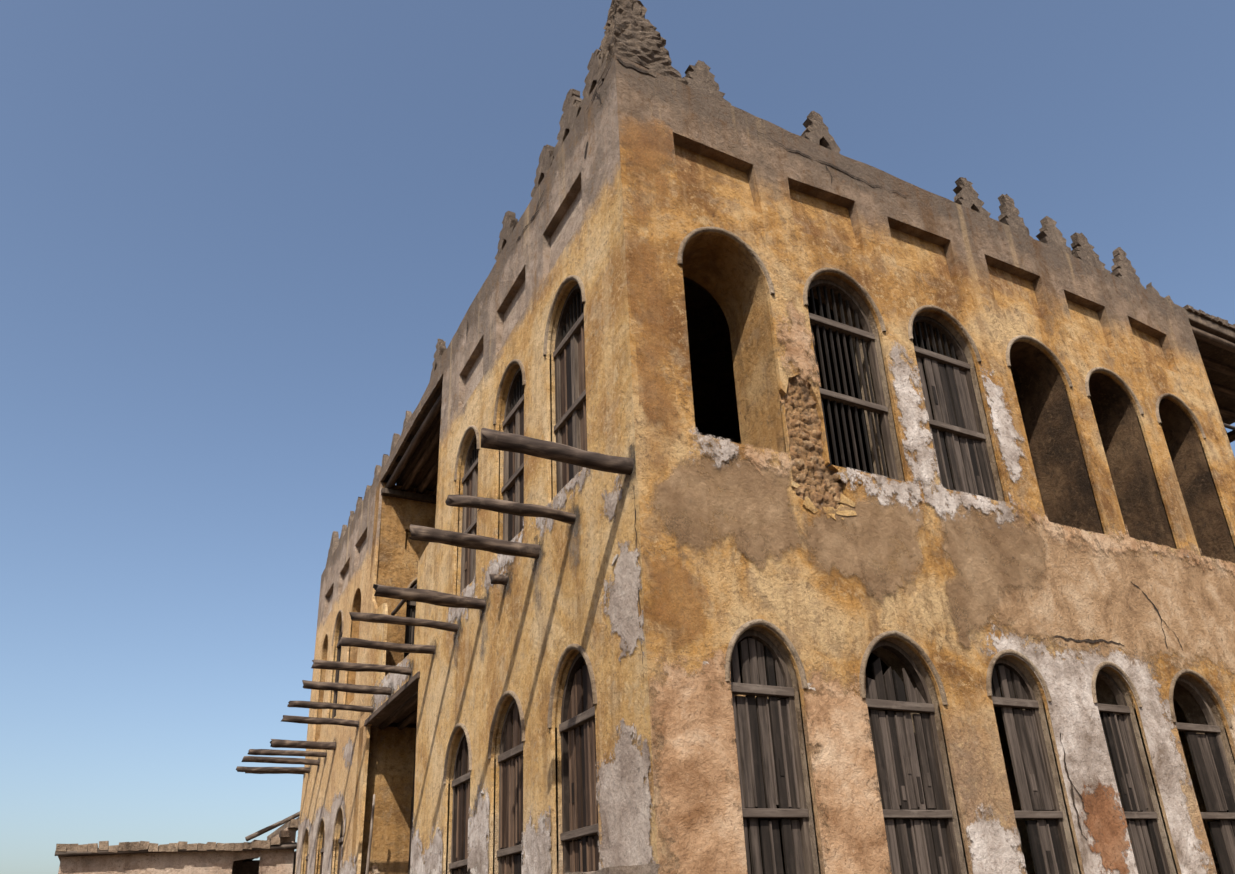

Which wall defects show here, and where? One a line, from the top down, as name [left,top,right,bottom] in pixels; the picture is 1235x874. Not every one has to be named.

leakage [651,455,924,603]
peeling [689,302,1235,874]
leakage [942,507,1046,648]
peeling [595,540,748,874]
peeling [295,791,380,874]
peeling [410,818,443,874]
peeling [467,784,489,874]
peeling [521,806,551,874]